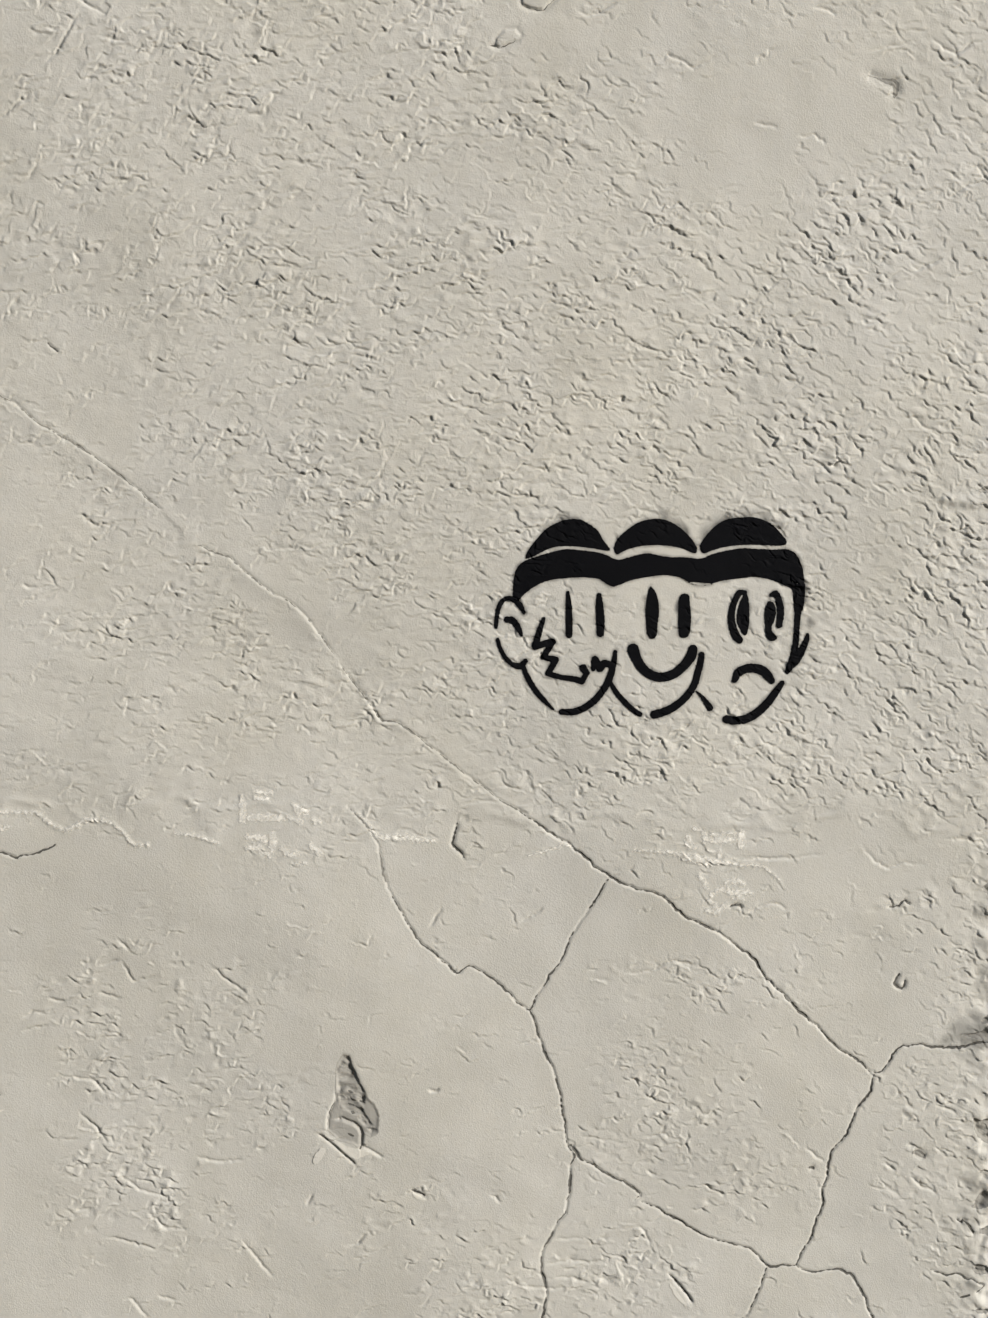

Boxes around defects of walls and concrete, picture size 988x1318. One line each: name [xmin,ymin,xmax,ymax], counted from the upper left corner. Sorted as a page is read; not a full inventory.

crack [0,395,159,508]
crack [0,844,56,859]
crack [198,545,988,1318]
hole [961,1015,988,1042]
flaking render [313,1055,380,1164]
hole [973,1118,988,1143]
hole [971,1190,988,1209]
spalling [973,1264,988,1275]